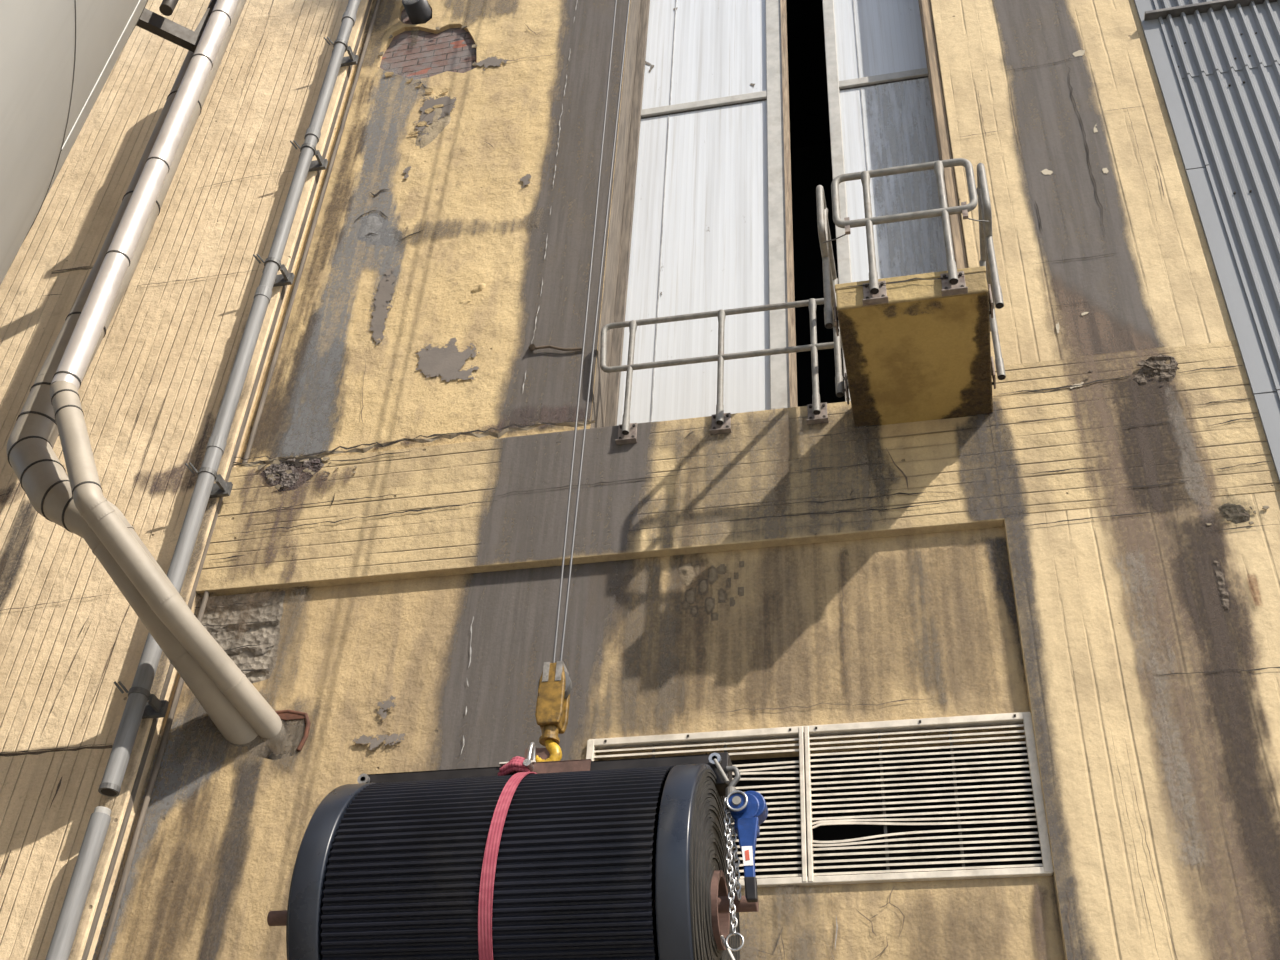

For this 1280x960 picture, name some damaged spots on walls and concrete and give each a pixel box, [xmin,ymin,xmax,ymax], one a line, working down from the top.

flaking render [379,8,508,141]
crack [962,57,1164,264]
peeling [416,337,479,384]
damp [250,0,684,770]
spalling [1133,355,1179,385]
spalling [258,455,357,492]
damp [994,0,1280,960]
spalling [1206,503,1269,526]
crack [0,592,130,810]
flaking render [194,591,285,683]